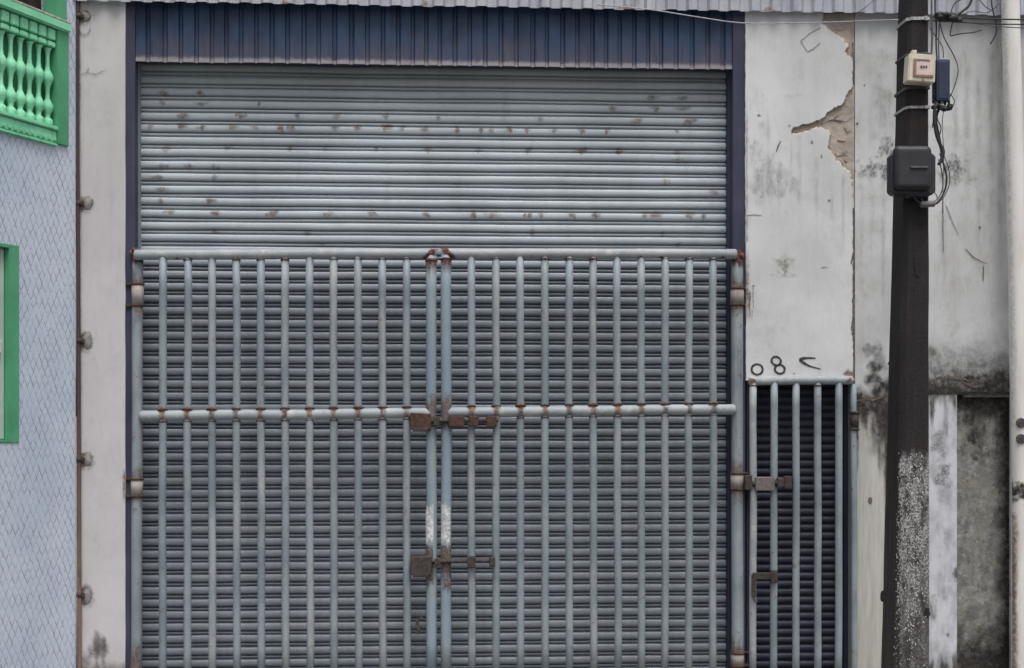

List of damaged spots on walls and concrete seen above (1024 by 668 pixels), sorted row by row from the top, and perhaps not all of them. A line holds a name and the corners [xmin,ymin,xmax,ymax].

spalling [822,14,854,59]
spalling [788,84,865,206]
water stain [857,361,888,480]
water stain [929,352,1010,668]